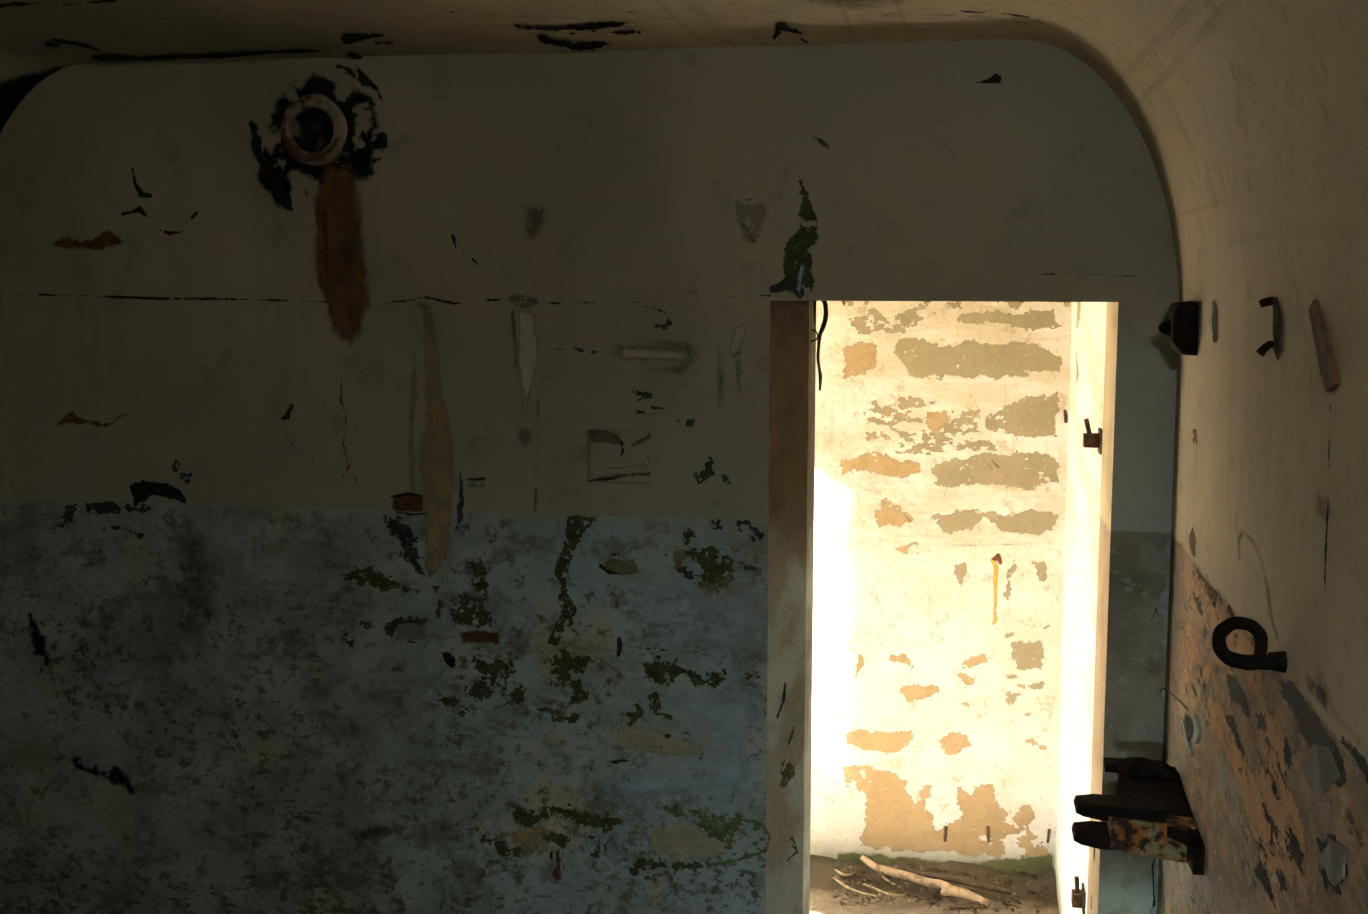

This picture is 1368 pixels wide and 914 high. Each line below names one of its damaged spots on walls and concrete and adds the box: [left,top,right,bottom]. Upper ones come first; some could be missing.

corrosion [305,166,370,342]
spalling [843,301,1081,381]
spalling [840,392,1060,490]
spalling [875,498,913,527]
spalling [930,509,1059,535]
corrosion [991,553,1003,624]
spalling [1003,561,1047,600]
spalling [889,654,939,702]
spalling [958,654,987,707]
spalling [1002,625,1050,716]
flaking render [1157,539,1348,914]
spalling [841,729,1052,859]